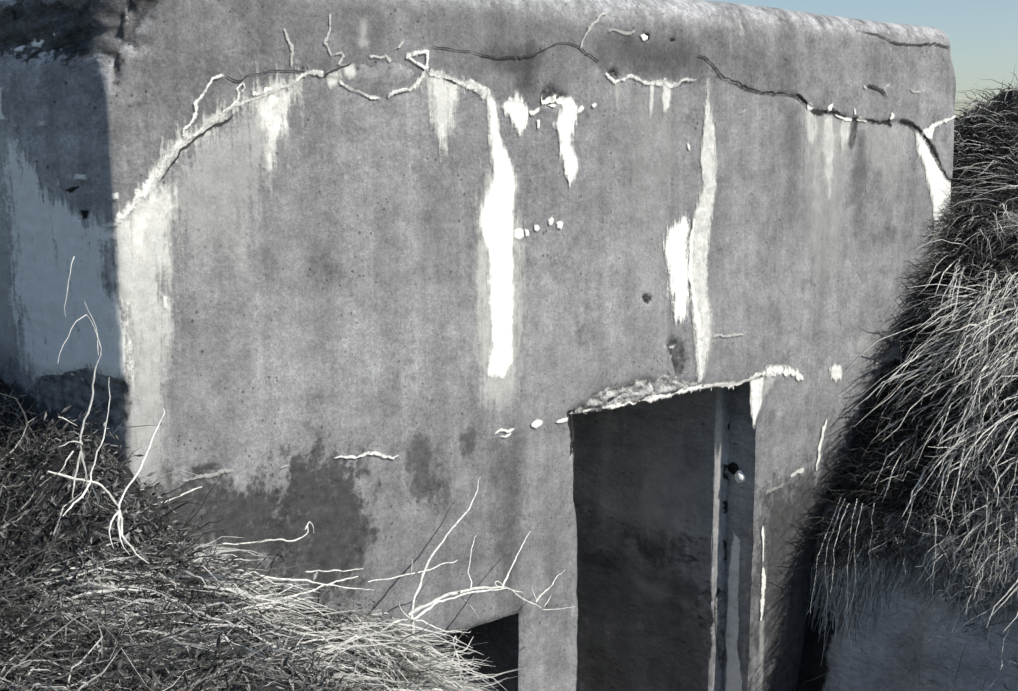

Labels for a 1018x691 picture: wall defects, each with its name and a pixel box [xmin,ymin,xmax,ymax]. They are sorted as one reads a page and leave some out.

damp [0,137,177,439]
crack [100,14,425,243]
damp [425,69,521,379]
crack [434,11,956,182]
damp [687,80,717,383]
damp [916,127,951,268]
crack [185,469,233,481]
damp [145,442,376,606]
crack [335,451,399,459]
spalling [567,340,751,455]